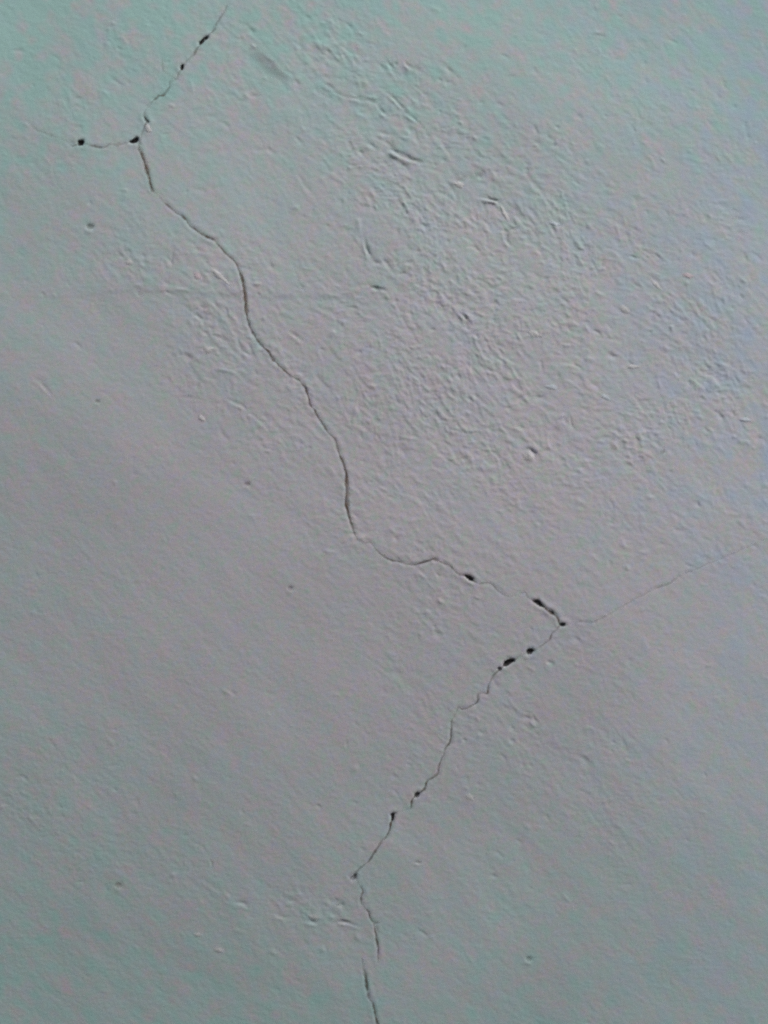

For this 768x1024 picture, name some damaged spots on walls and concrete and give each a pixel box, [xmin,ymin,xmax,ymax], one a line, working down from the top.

crack [130,117,151,184]
crack [533,600,565,627]
crack [477,648,534,702]
crack [390,731,452,828]